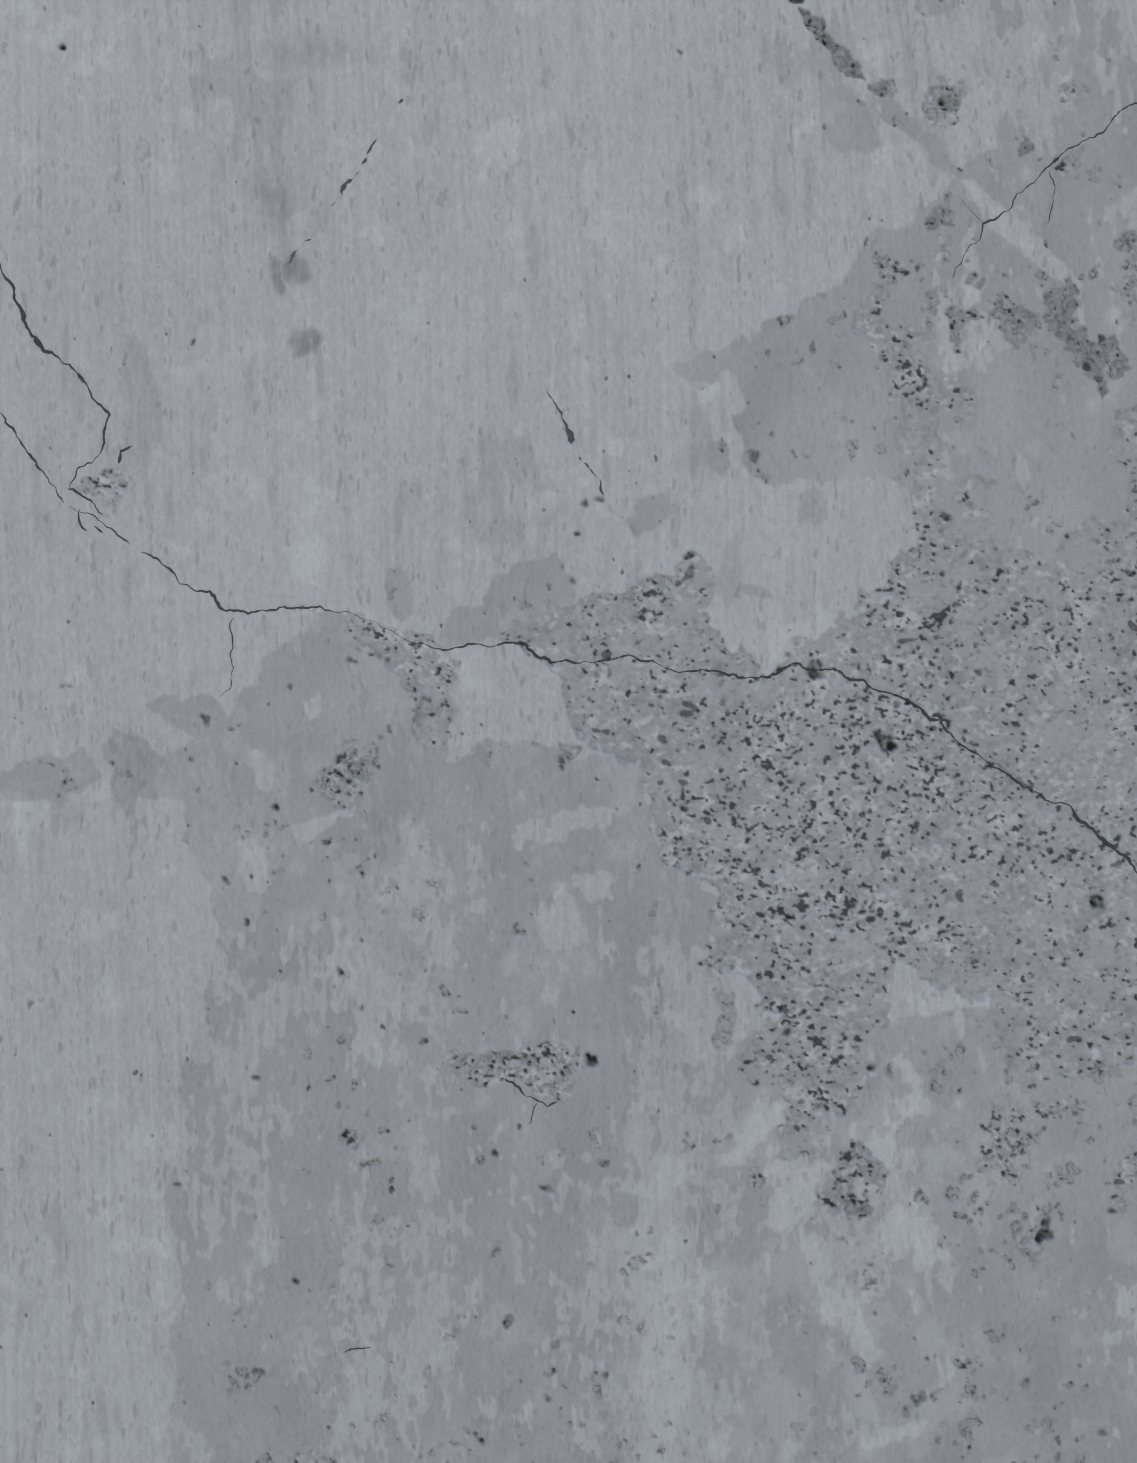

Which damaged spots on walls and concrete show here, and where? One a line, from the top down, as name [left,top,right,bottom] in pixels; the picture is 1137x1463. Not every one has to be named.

crack [952,102,1137,279]
peeling [386,567,415,623]
crack [0,264,1137,873]
spalling [443,0,1137,1163]
peeling [0,747,102,811]
peeling [103,611,462,934]
peeling [154,739,1137,1463]